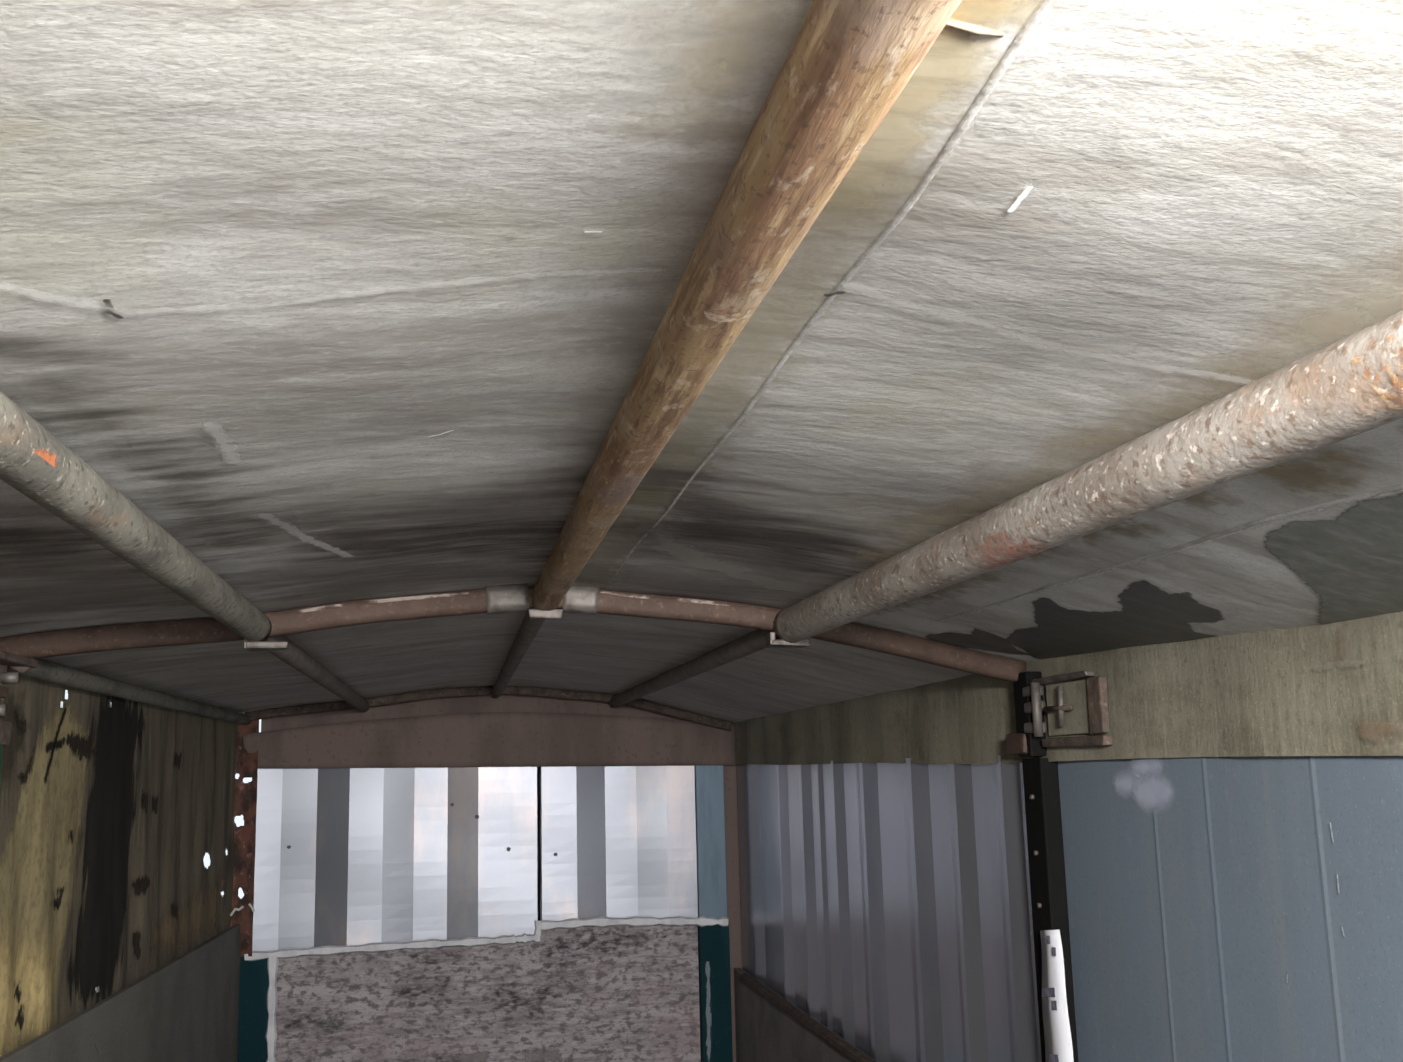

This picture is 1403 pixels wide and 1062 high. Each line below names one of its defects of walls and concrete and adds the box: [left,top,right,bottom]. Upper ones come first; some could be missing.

corrosion [1157,350,1278,420]
corrosion [1353,336,1403,409]
leakage [0,695,224,1053]